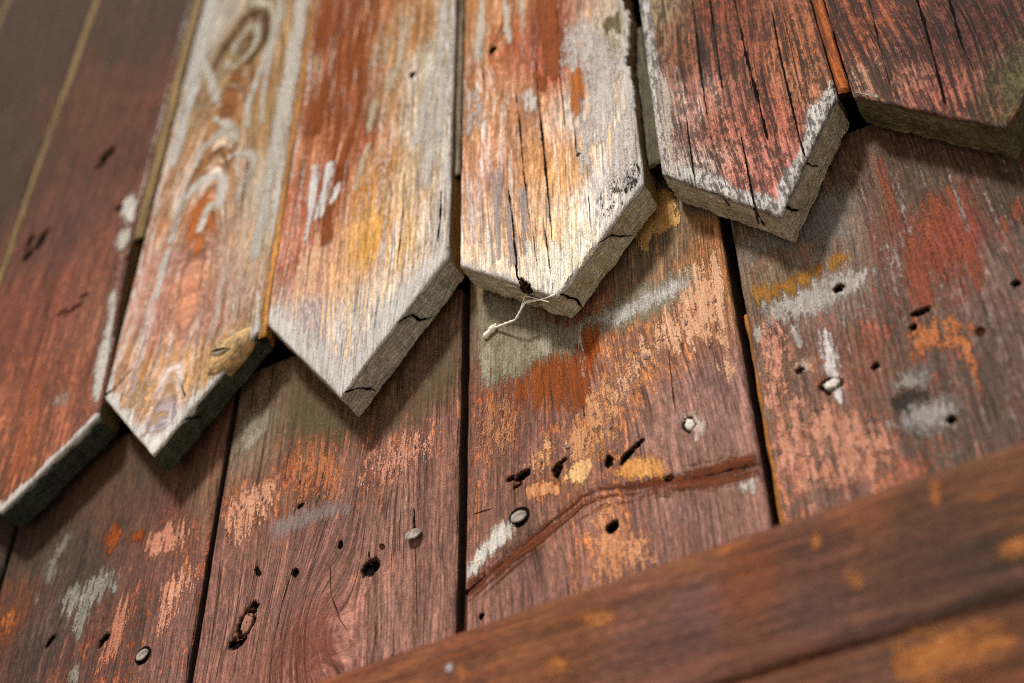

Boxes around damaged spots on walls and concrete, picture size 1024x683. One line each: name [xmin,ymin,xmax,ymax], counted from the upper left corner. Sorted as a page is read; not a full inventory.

crack [915,0,946,105]
crack [508,4,583,309]
crack [686,0,768,227]
peeling [182,193,216,257]
peeling [636,189,681,252]
peeling [748,250,849,305]
peeling [475,244,736,501]
peeling [758,316,897,494]
peeling [905,313,985,396]
peeling [93,577,146,677]
peeling [143,517,199,638]
crack [464,507,563,596]